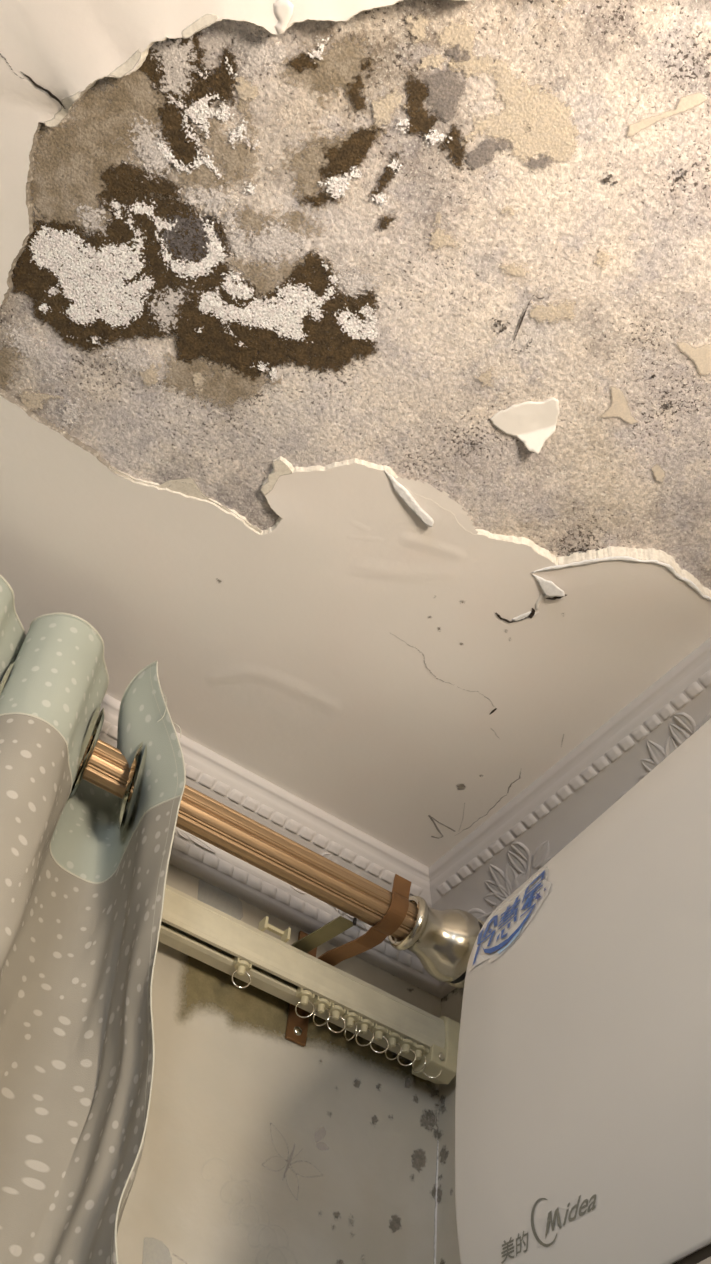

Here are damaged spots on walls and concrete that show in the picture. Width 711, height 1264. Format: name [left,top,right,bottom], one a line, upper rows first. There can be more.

crack [0,54,65,109]
leakage [0,24,467,408]
spalling [0,0,711,597]
leakage [50,393,93,430]
leakage [389,1215,401,1232]